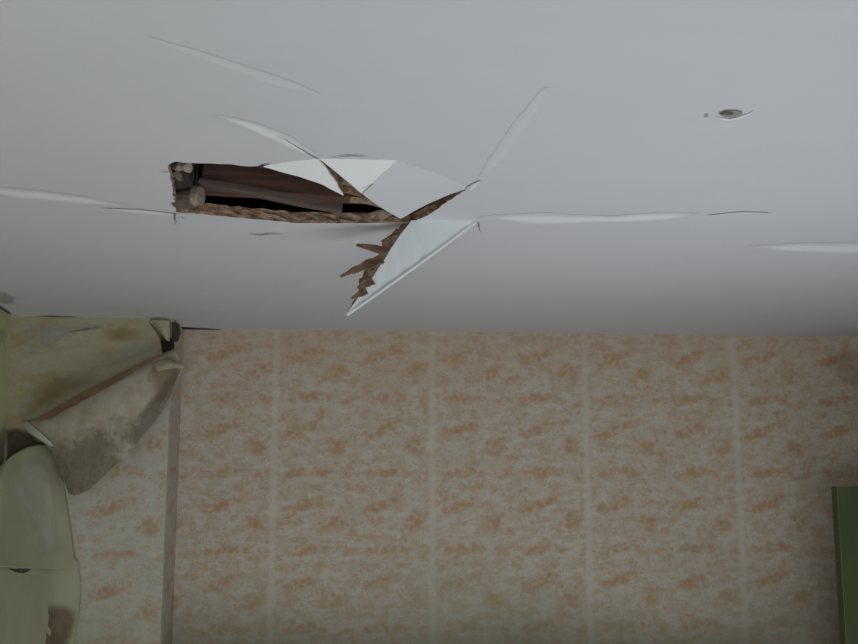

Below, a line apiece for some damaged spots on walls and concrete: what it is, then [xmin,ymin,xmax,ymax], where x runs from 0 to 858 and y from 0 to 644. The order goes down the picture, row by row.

spalling [704,111,753,121]
spalling [168,164,466,223]
flaking render [5,316,174,437]